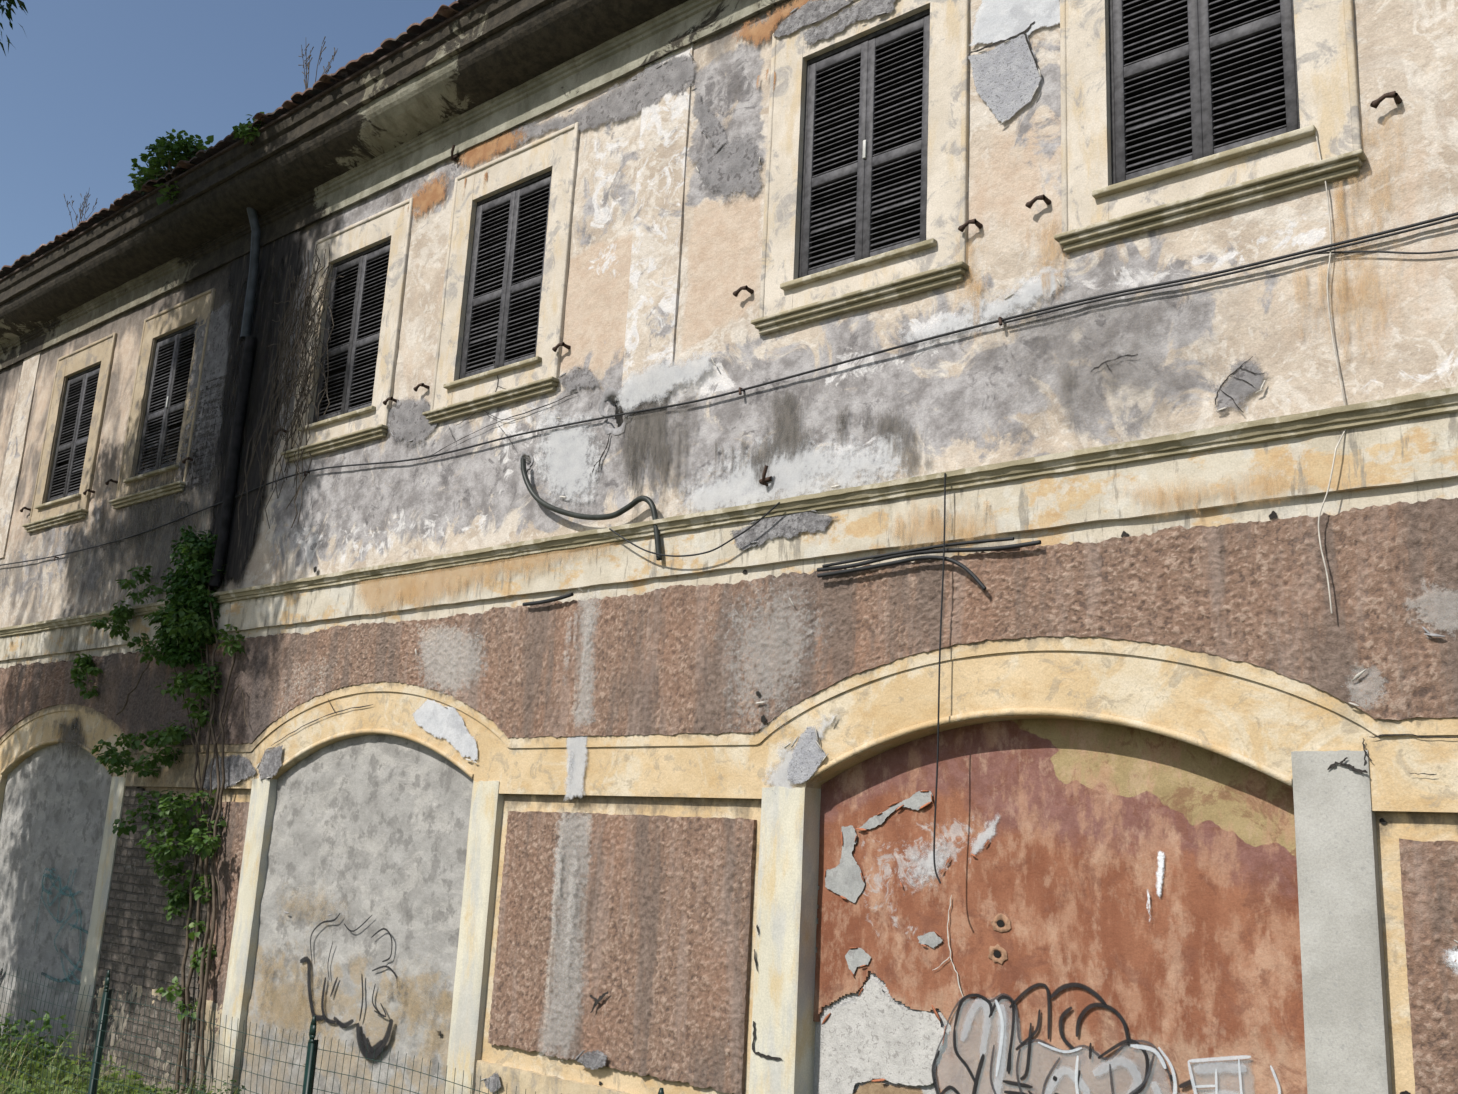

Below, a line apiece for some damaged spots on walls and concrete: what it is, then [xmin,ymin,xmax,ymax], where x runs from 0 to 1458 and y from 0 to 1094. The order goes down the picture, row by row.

spalling [968,0,1060,125]
spalling [499,53,763,202]
spalling [1214,360,1268,413]
water stain [536,408,601,505]
water stain [619,352,929,523]
peeling [413,699,478,763]
spalling [767,715,838,789]
peeling [824,790,933,903]
peeling [900,839,950,888]
peeling [971,817,999,857]
peeling [820,947,946,1094]